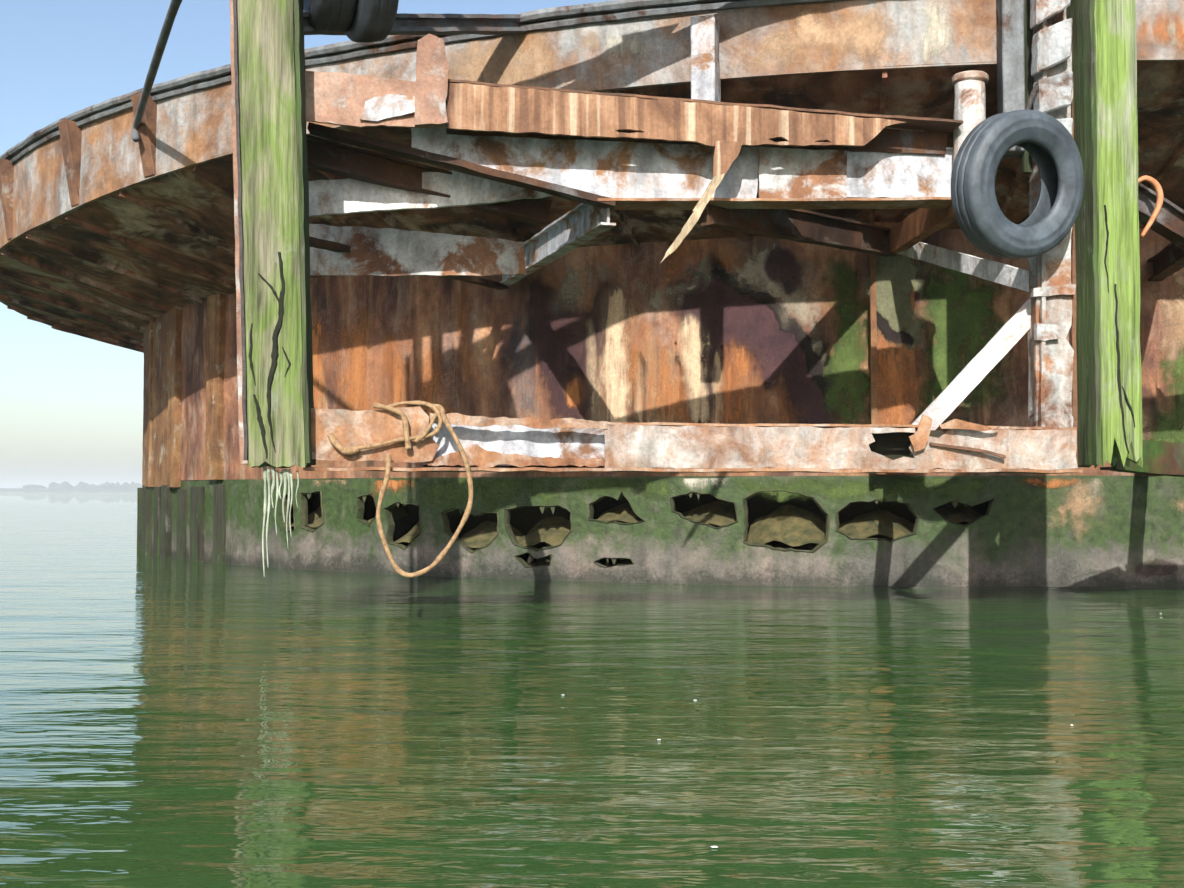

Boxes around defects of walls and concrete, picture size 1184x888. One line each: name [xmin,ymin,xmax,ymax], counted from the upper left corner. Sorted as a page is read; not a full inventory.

rust [1140,17,1184,46]
crack [248,252,291,458]
rust [312,313,369,411]
rust [385,332,409,408]
rust [423,352,440,423]
rust [529,279,620,420]
rust [630,265,837,424]
damp [823,259,870,424]
crack [1104,205,1135,454]